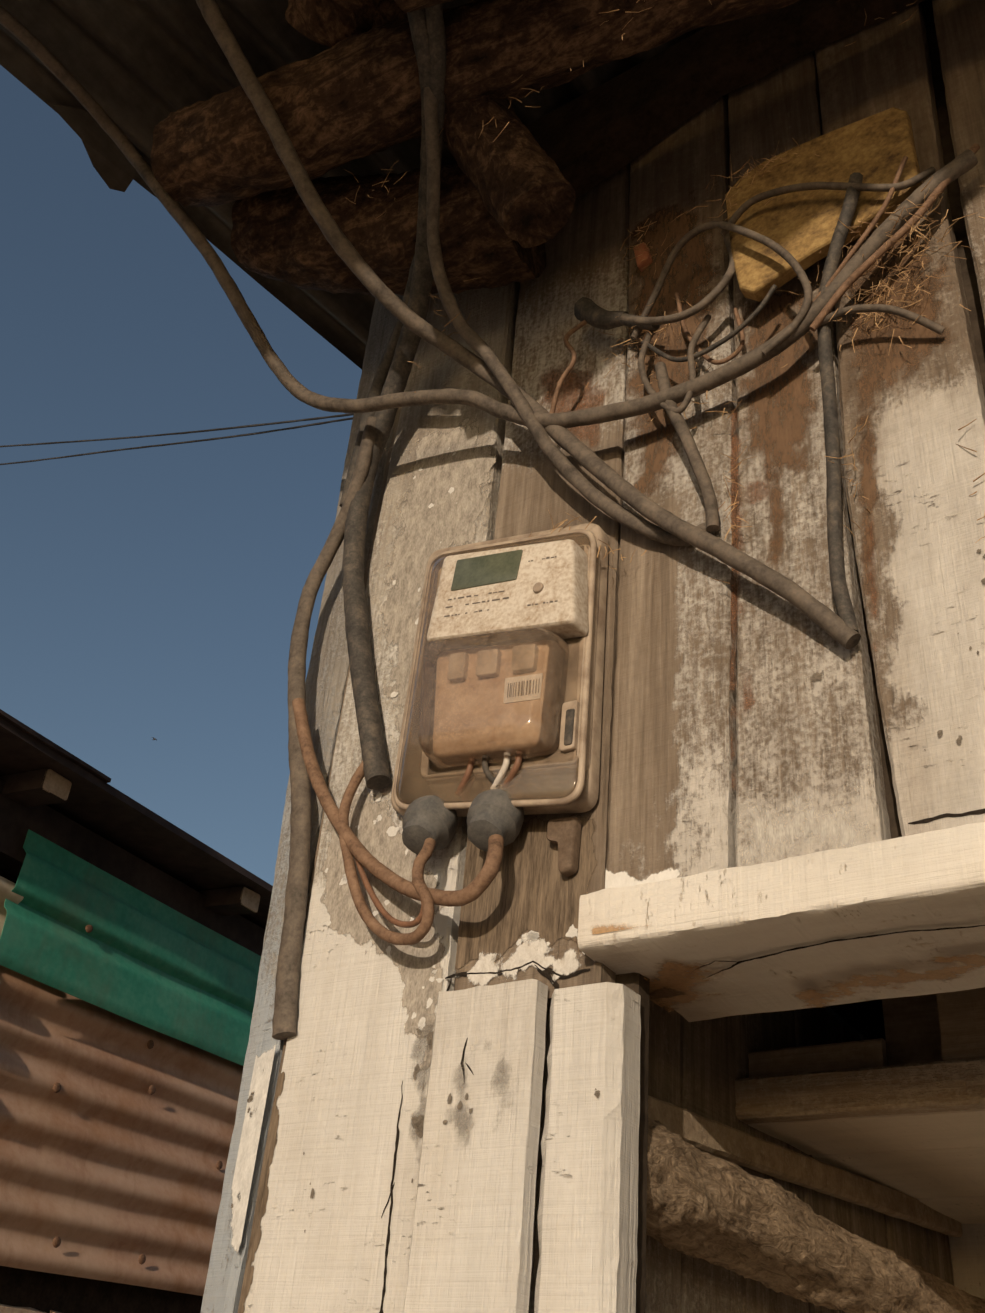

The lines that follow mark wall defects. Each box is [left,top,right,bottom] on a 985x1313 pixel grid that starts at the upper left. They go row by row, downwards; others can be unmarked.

damp [626,205,717,398]
damp [741,291,803,355]
damp [631,402,682,495]
damp [738,329,818,562]
crack [460,1039,474,1083]
peeling [320,791,680,1138]
crack [379,1081,403,1313]